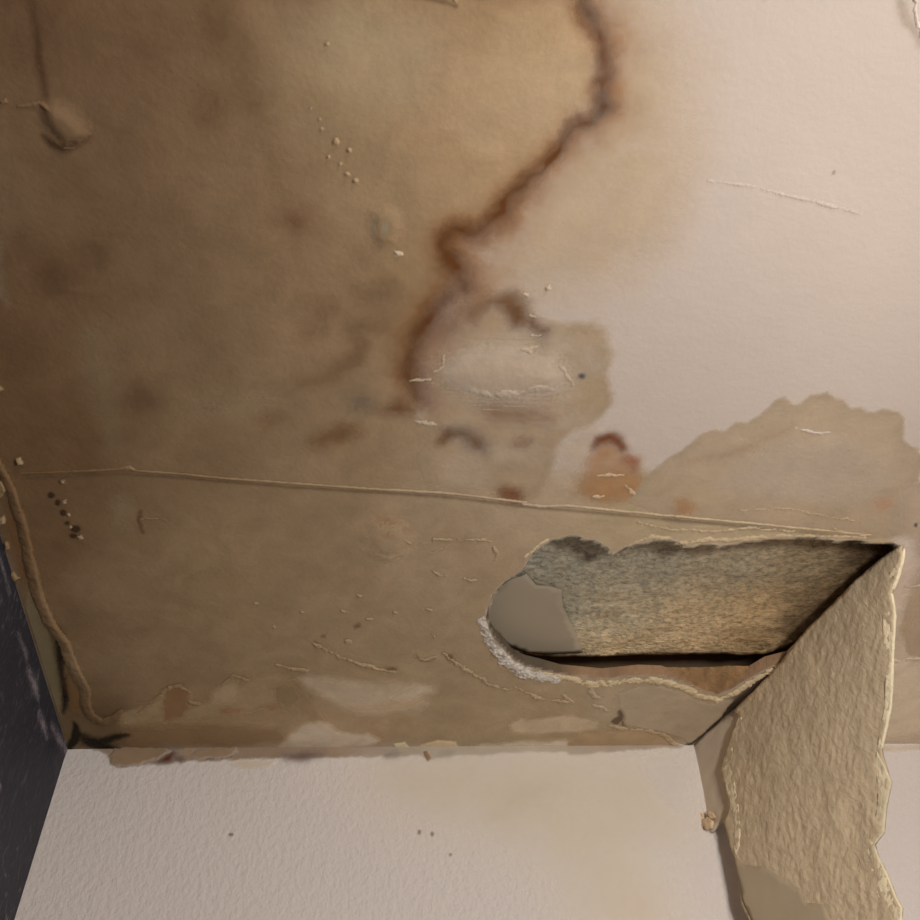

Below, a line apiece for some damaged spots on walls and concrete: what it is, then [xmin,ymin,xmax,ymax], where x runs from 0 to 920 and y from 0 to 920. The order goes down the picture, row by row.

crack [900,0,920,31]
water stain [0,0,859,748]
crack [19,465,872,536]
crack [55,639,128,749]
water stain [885,731,920,744]